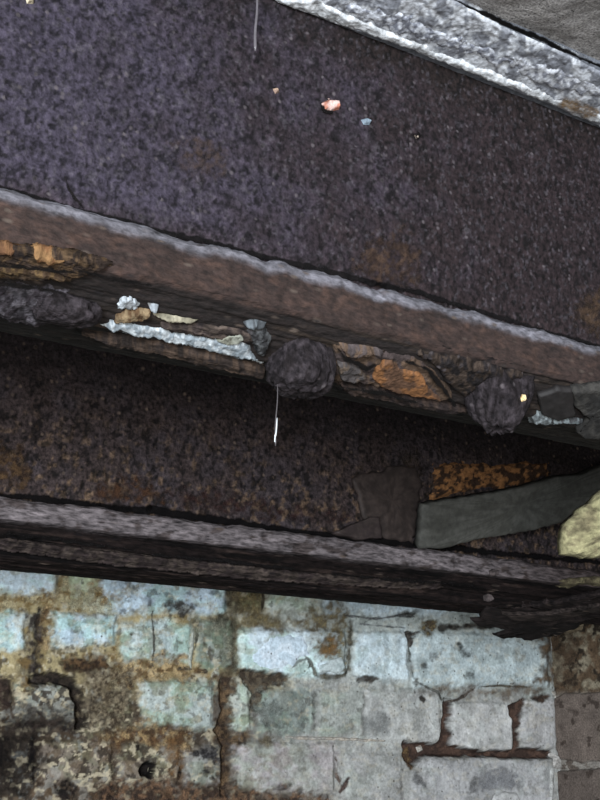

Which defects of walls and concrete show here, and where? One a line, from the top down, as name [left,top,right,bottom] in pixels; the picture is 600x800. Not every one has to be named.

water stain [164,600,194,616]
peeling [470,589,600,641]
water stain [25,608,45,682]
crack [292,657,317,676]
water stain [63,653,134,730]
water stain [0,681,76,796]
water stain [193,746,219,779]
water stain [260,693,388,742]
water stain [54,780,77,800]